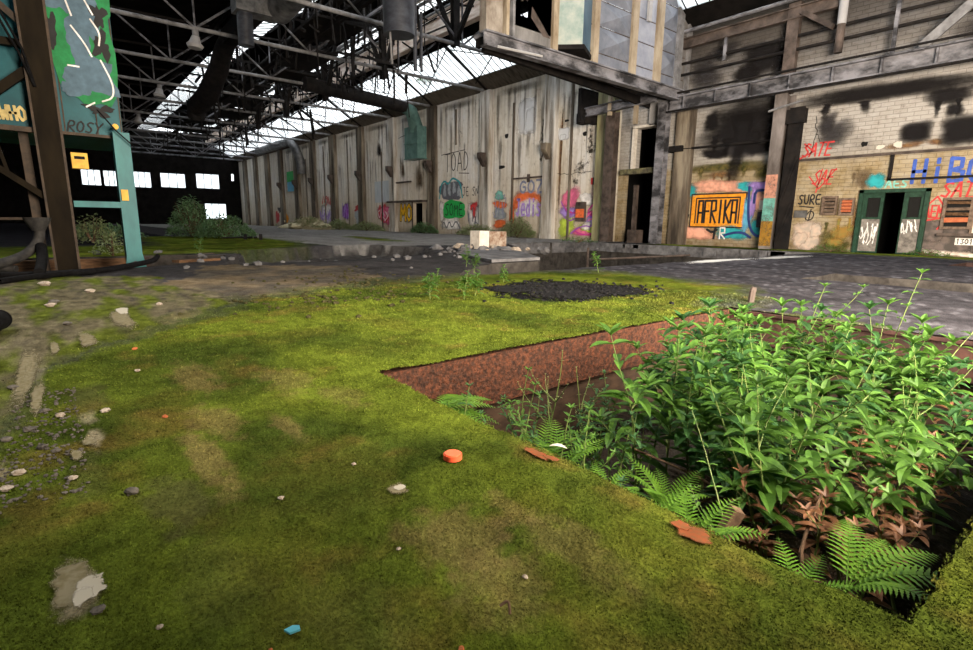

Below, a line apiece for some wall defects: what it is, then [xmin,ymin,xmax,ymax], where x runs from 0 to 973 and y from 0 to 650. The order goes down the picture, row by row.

leakage [712,115,752,181]